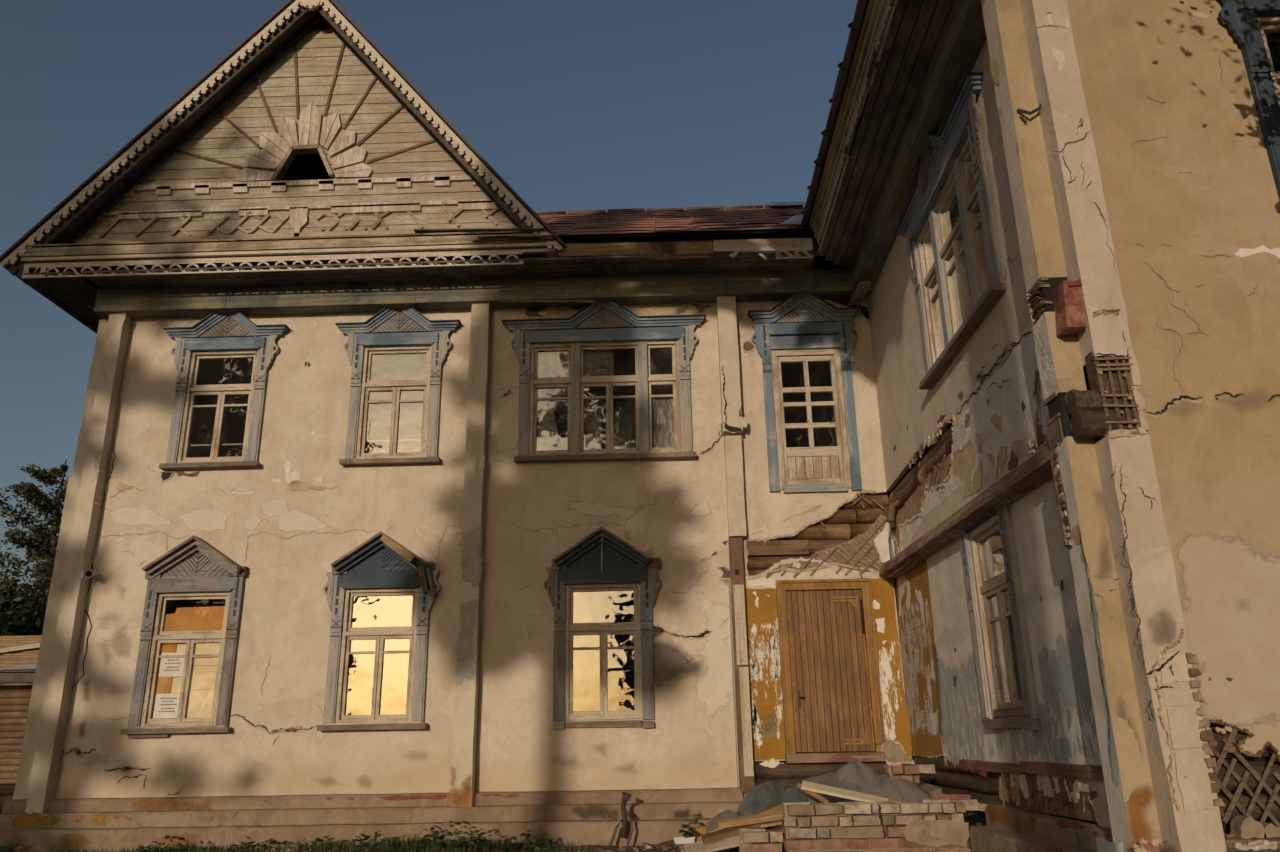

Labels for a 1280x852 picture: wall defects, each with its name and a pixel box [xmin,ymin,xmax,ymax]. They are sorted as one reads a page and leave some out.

crack [1054,119,1280,418]
crack [700,364,742,455]
crack [72,432,192,689]
peeling [700,368,1085,607]
crack [60,747,150,789]
crack [230,657,323,744]
peeling [652,592,733,716]
peeling [747,617,784,768]
peeling [873,574,1168,852]
spalling [1151,628,1185,812]
spalling [1205,719,1280,763]